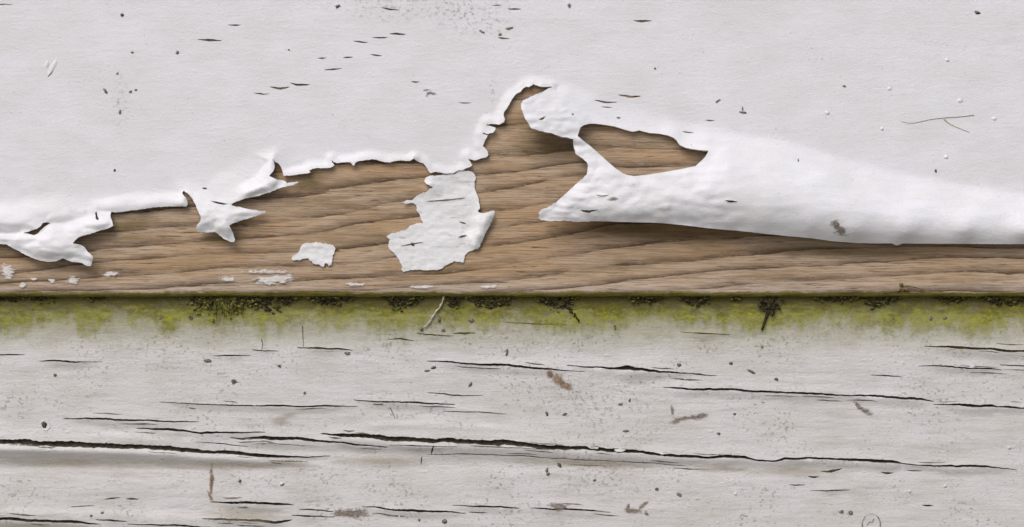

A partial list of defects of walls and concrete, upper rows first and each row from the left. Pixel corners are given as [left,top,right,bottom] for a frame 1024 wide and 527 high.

peeling [0,76,1024,272]
crack [428,361,1024,409]
crack [924,343,1024,374]
crack [0,393,1017,492]